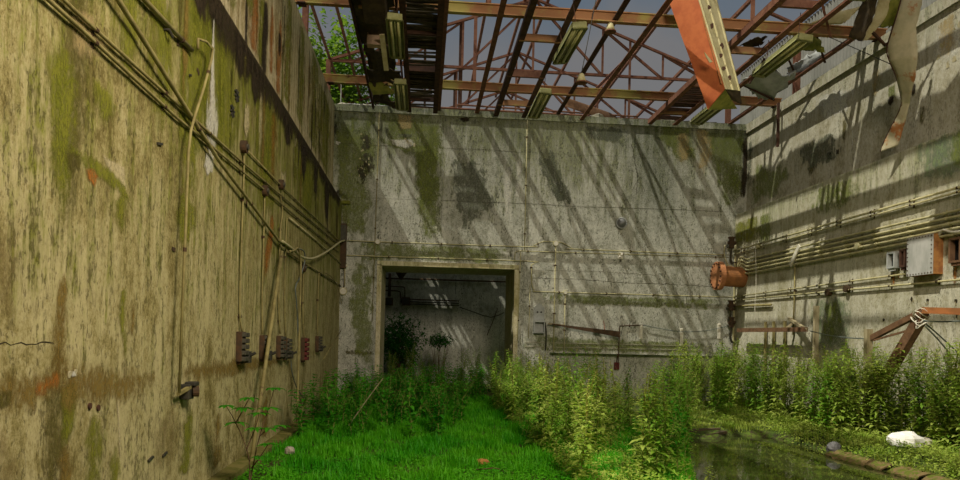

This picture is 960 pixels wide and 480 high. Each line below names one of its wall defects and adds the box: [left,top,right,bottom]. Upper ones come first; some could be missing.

damp [47,0,128,228]
damp [121,0,347,242]
crack [0,339,53,347]
damp [0,278,155,480]
damp [185,357,283,381]